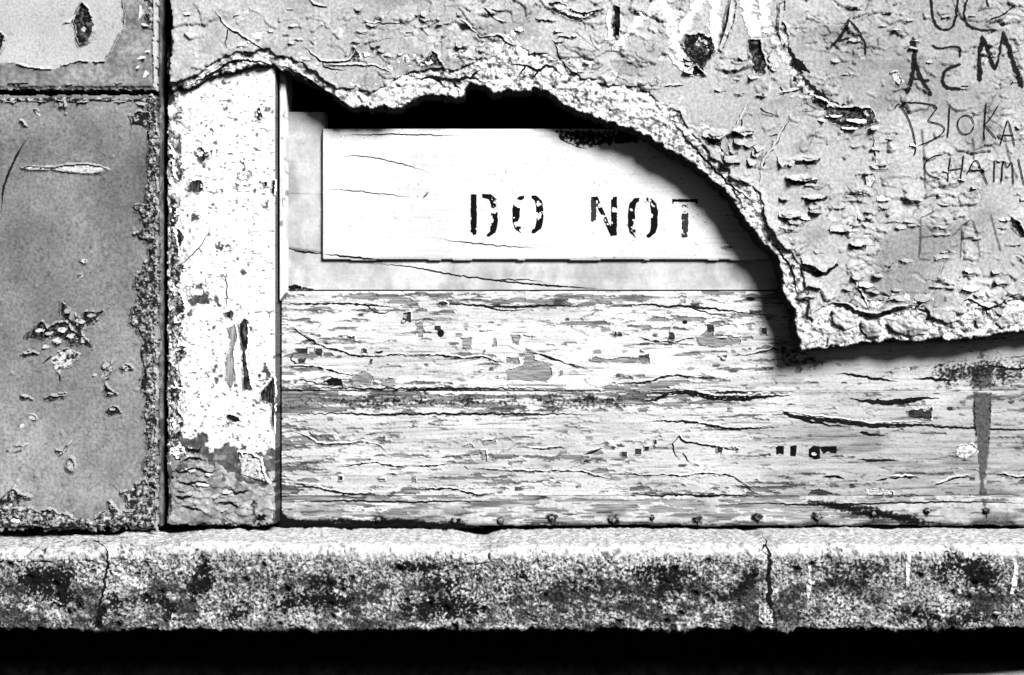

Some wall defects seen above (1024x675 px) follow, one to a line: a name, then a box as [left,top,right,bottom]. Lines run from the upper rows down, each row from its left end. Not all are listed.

peeling [0,0,158,115]
spalling [171,0,1024,353]
peeling [20,302,104,402]
peeling [167,142,276,526]
peeling [506,333,563,383]
peeling [697,322,742,360]
damp [932,355,1024,508]
crack [92,539,114,625]
damp [112,571,151,591]
crack [759,532,777,630]
damp [906,551,922,586]
damp [1010,562,1018,594]